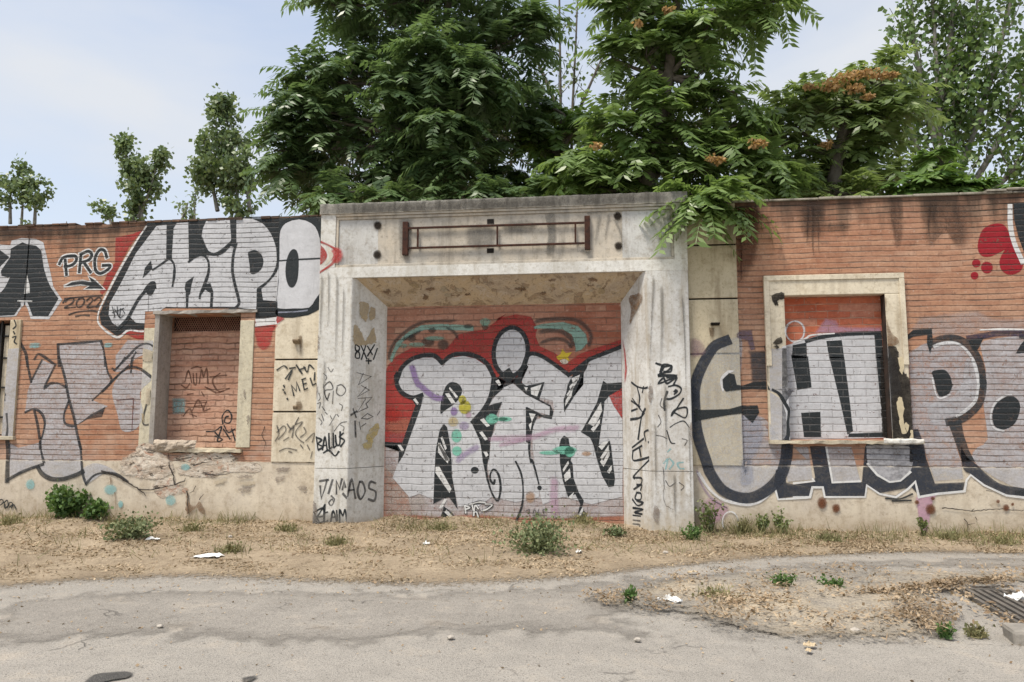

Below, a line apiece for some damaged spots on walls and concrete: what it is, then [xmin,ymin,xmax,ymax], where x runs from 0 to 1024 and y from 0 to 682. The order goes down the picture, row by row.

spalling [119,443,262,514]